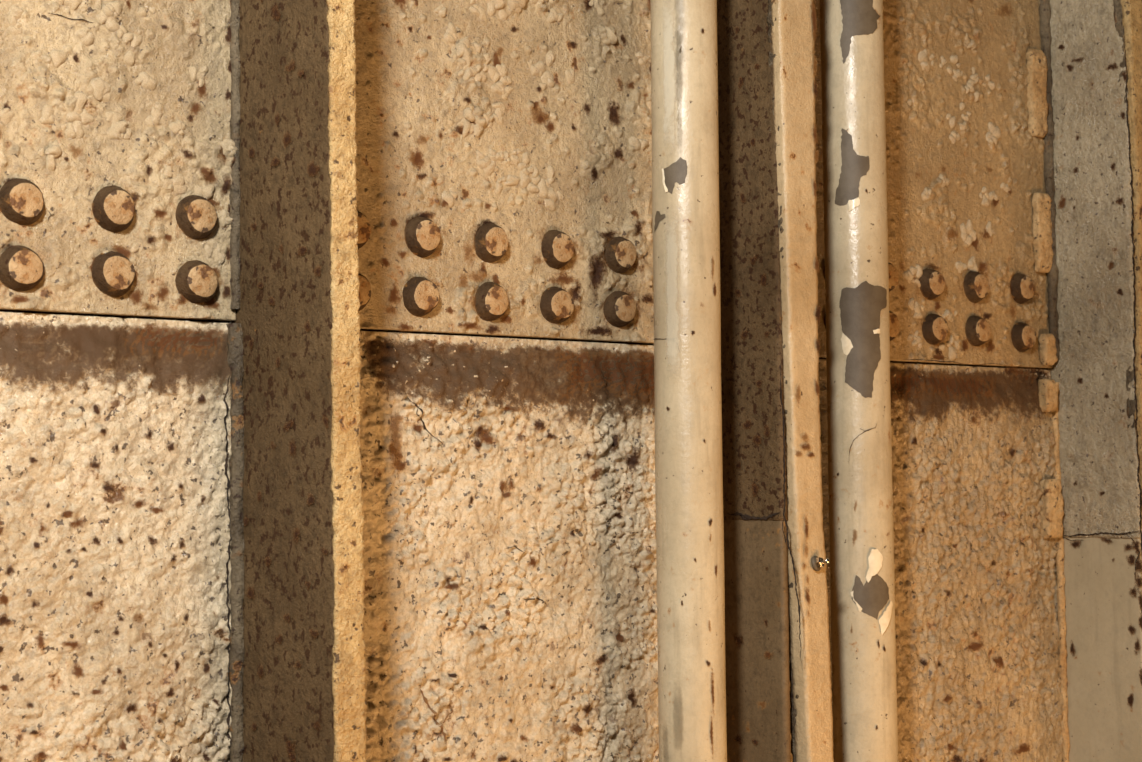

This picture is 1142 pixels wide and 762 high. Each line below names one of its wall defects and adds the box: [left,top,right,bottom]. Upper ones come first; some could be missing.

peeling [840,0,880,64]
corrosion [187,78,206,122]
corrosion [200,146,236,213]
peeling [662,157,687,194]
peeling [835,128,870,211]
corrosion [112,245,130,258]
corrosion [203,268,231,308]
peeling [839,281,887,398]
crack [223,347,232,762]
peeling [850,549,893,635]